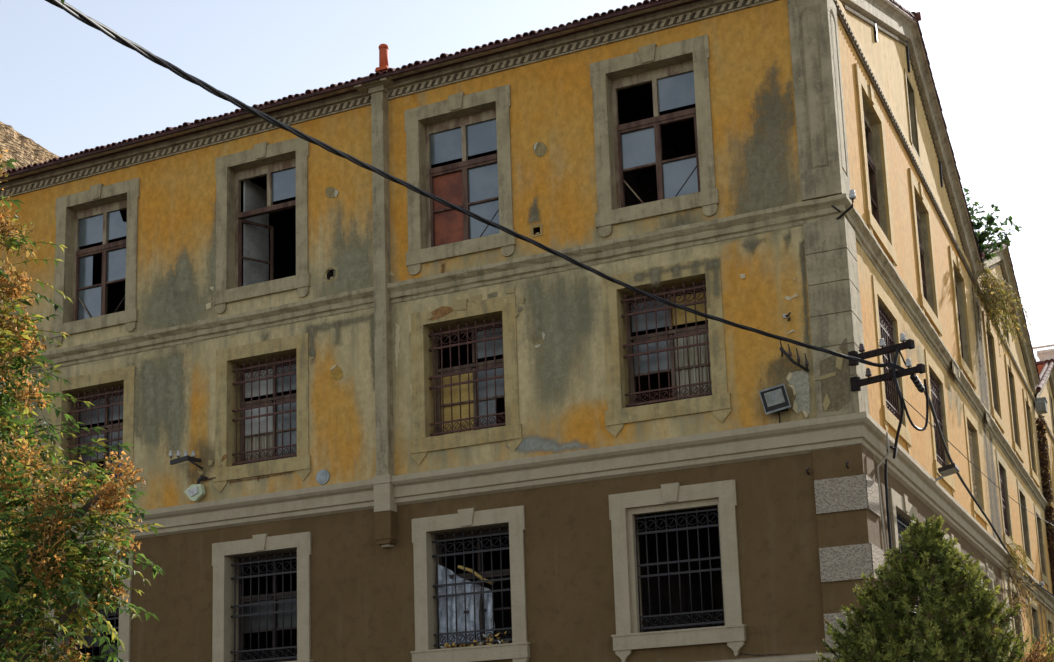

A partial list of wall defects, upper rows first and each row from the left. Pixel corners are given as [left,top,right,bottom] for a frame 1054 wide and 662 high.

leakage [735,67,796,215]
leakage [143,204,216,328]
leakage [134,354,183,451]
flaking render [786,338,850,418]